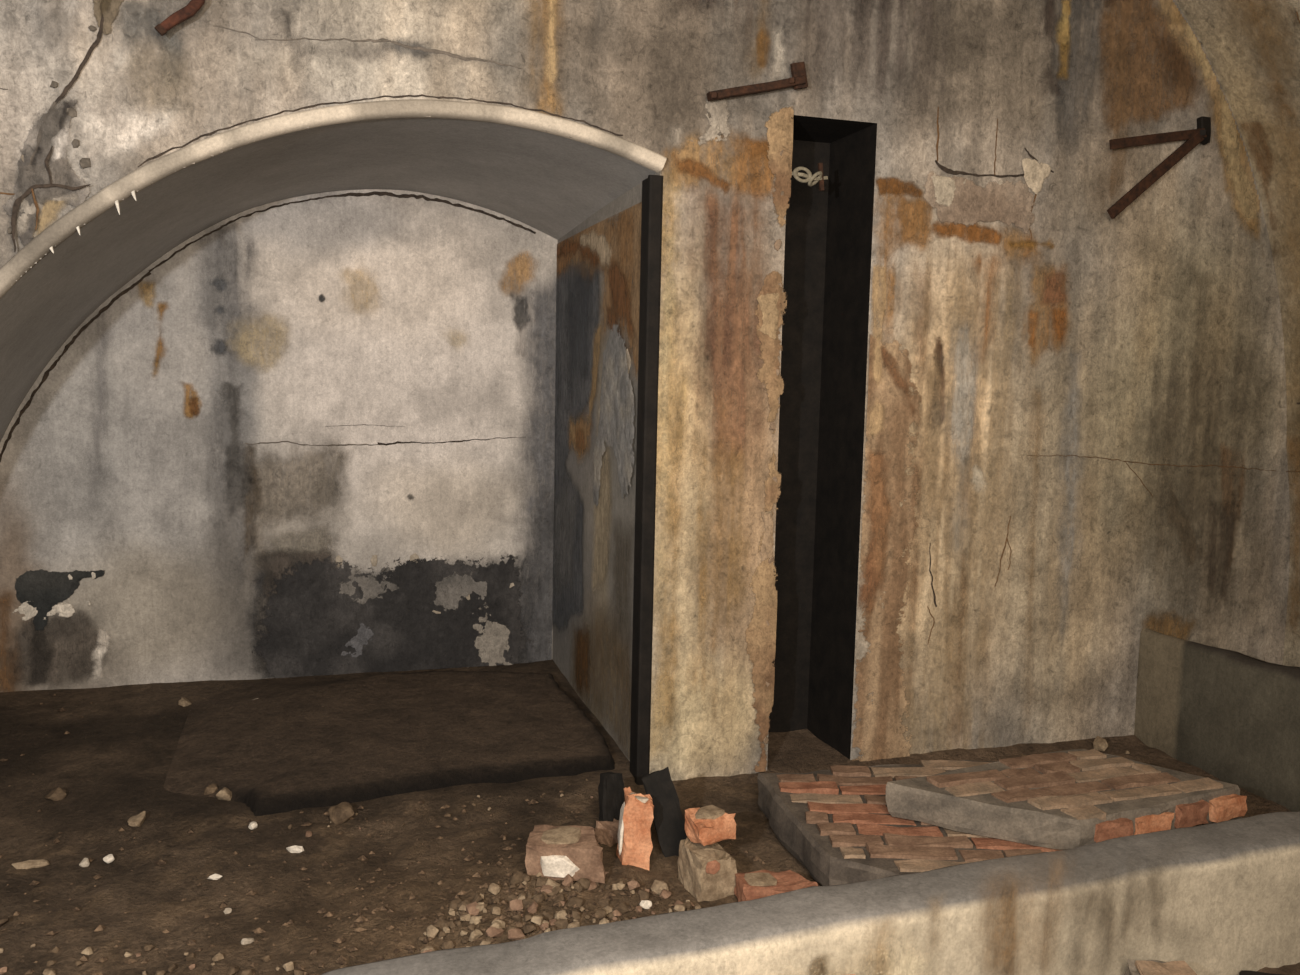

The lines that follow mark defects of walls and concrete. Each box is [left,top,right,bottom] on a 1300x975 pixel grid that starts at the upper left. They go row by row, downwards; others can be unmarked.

crack [213,25,522,69]
corrosion [540,0,556,111]
crack [0,2,104,252]
crack [138,94,623,167]
corrosion [670,137,774,194]
corrosion [876,178,1068,362]
crack [0,191,536,462]
peeling [13,569,105,631]